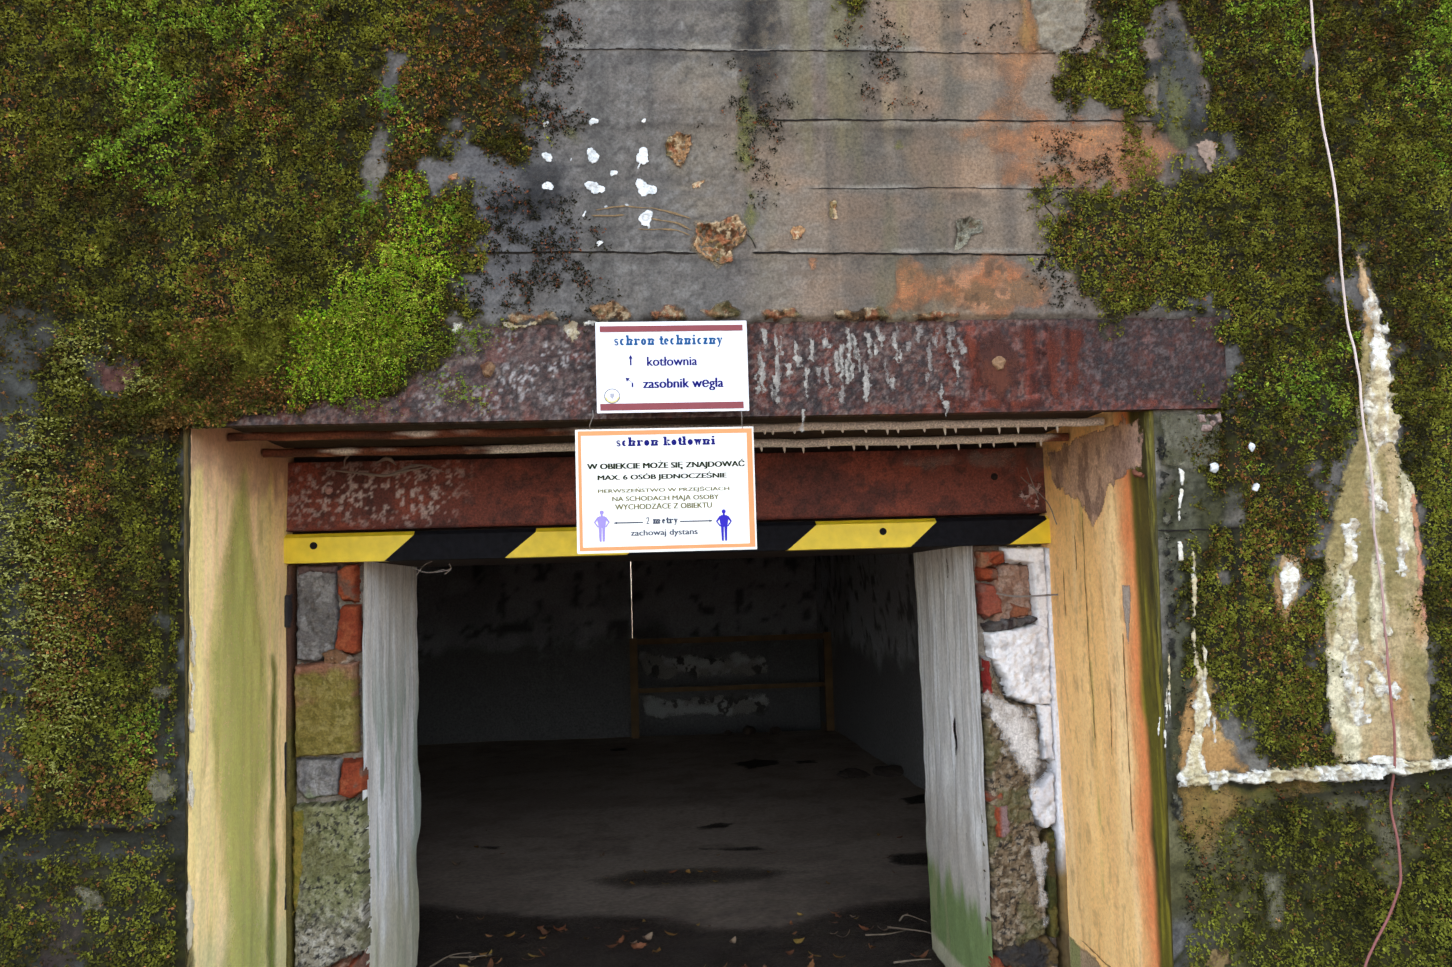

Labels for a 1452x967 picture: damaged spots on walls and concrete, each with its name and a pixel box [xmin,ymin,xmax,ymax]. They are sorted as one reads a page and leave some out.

spalling [665,132,693,168]
spalling [691,213,748,268]
rust [892,258,1049,398]
peeling [1048,411,1223,526]
spalling [1163,511,1175,586]
peeling [1122,585,1130,644]
spalling [1166,605,1177,659]
spalling [974,554,1059,967]